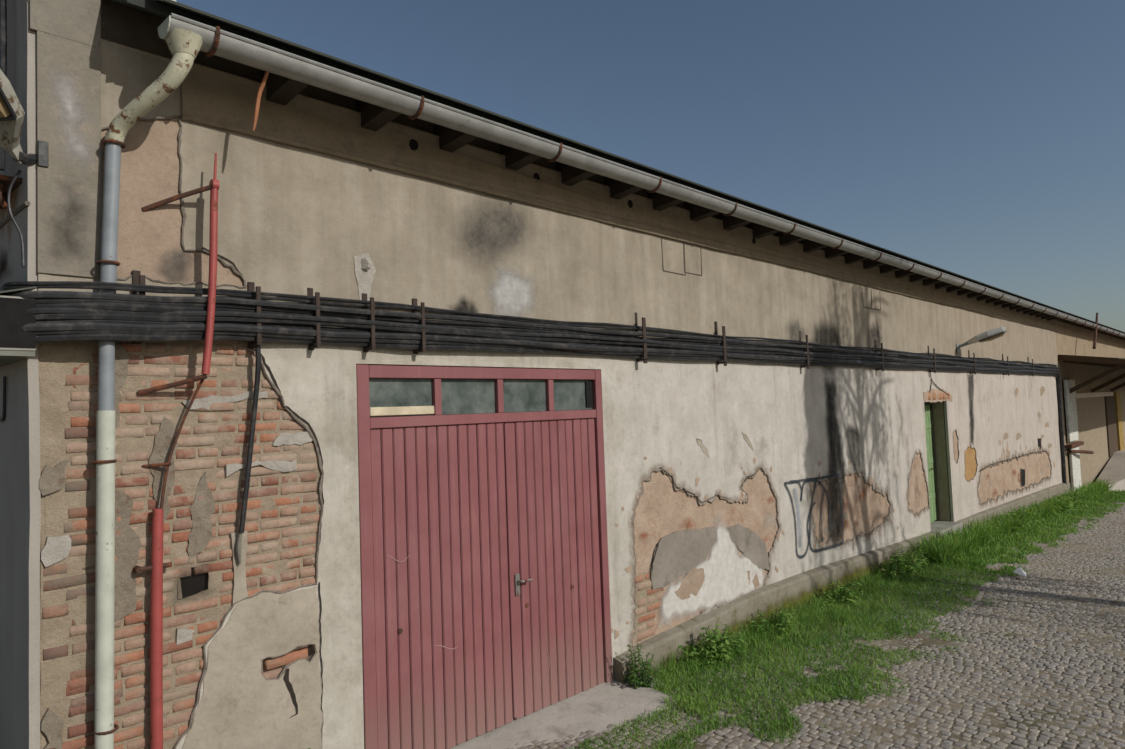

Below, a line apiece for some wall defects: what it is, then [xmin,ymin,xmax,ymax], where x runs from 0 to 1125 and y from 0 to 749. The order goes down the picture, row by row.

flaking render [38,341,98,749]
flaking render [114,341,324,749]
flaking render [611,432,785,648]
leakage [827,384,860,541]
flaking render [809,450,930,550]
flaking render [953,412,1055,508]